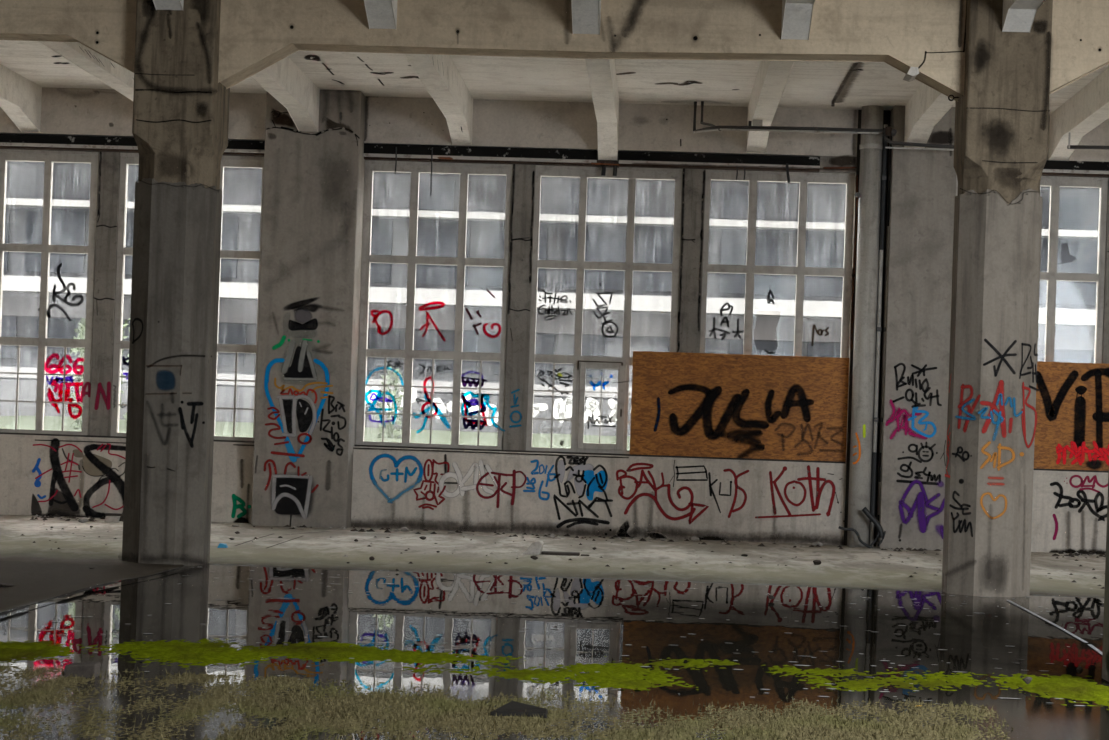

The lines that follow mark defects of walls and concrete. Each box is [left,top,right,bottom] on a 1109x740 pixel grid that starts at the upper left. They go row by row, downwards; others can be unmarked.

damp [977,45,988,71]
damp [1034,22,1051,131]
flaking render [266,109,360,146]
damp [987,125,1012,149]